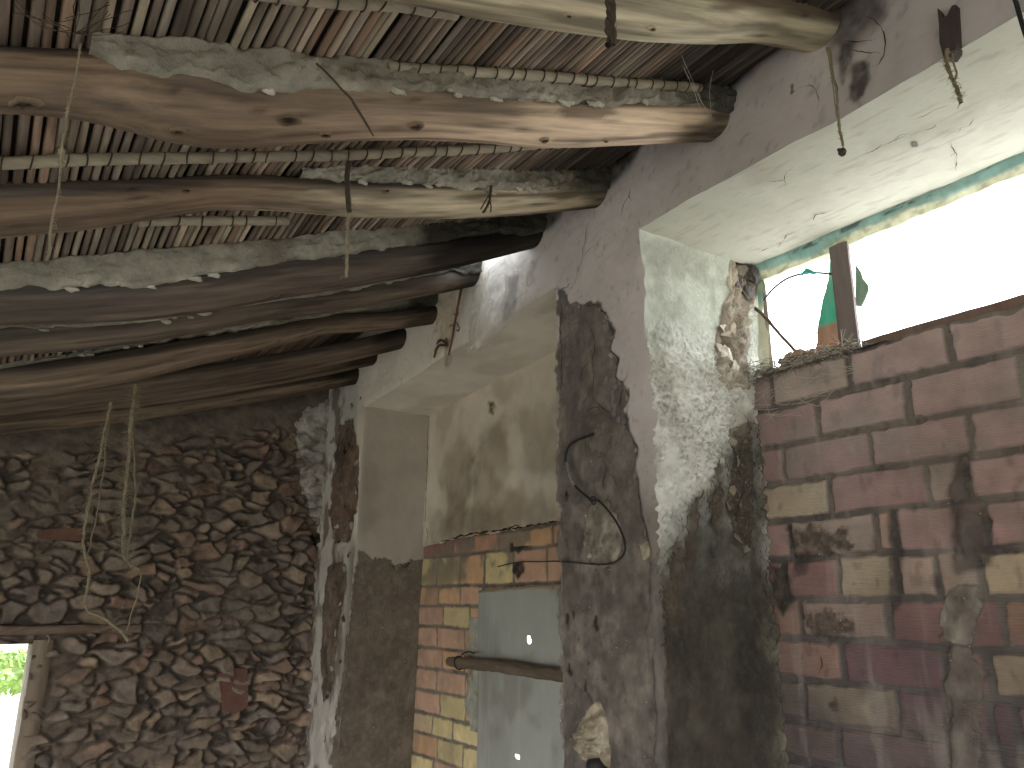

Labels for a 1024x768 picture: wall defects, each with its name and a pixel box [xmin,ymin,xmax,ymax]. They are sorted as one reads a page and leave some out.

water stain [840,45,869,101]
crack [845,14,886,67]
flaking render [715,260,760,389]
flaking render [294,397,423,768]
flaking render [554,289,657,768]
water stain [659,432,812,768]